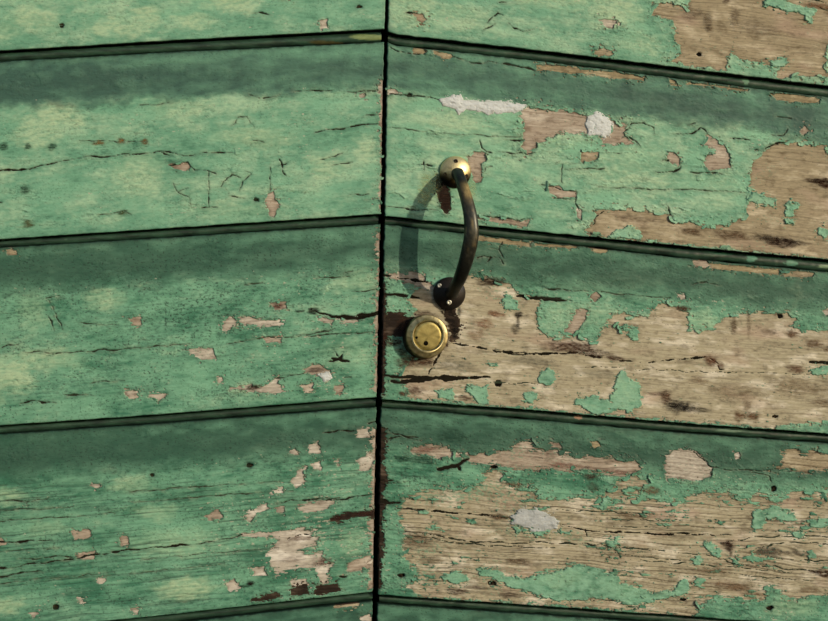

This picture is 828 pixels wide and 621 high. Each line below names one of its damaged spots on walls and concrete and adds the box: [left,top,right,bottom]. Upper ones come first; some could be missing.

peeling [647,0,828,84]
crack [0,160,68,171]
crack [88,140,249,208]
peeling [516,97,642,163]
peeling [544,121,828,259]
crack [2,344,130,354]
crack [234,272,428,343]
crack [329,354,349,378]
peeling [370,227,828,429]
crack [0,498,243,584]
peeling [236,426,828,616]
peeling [334,603,372,621]